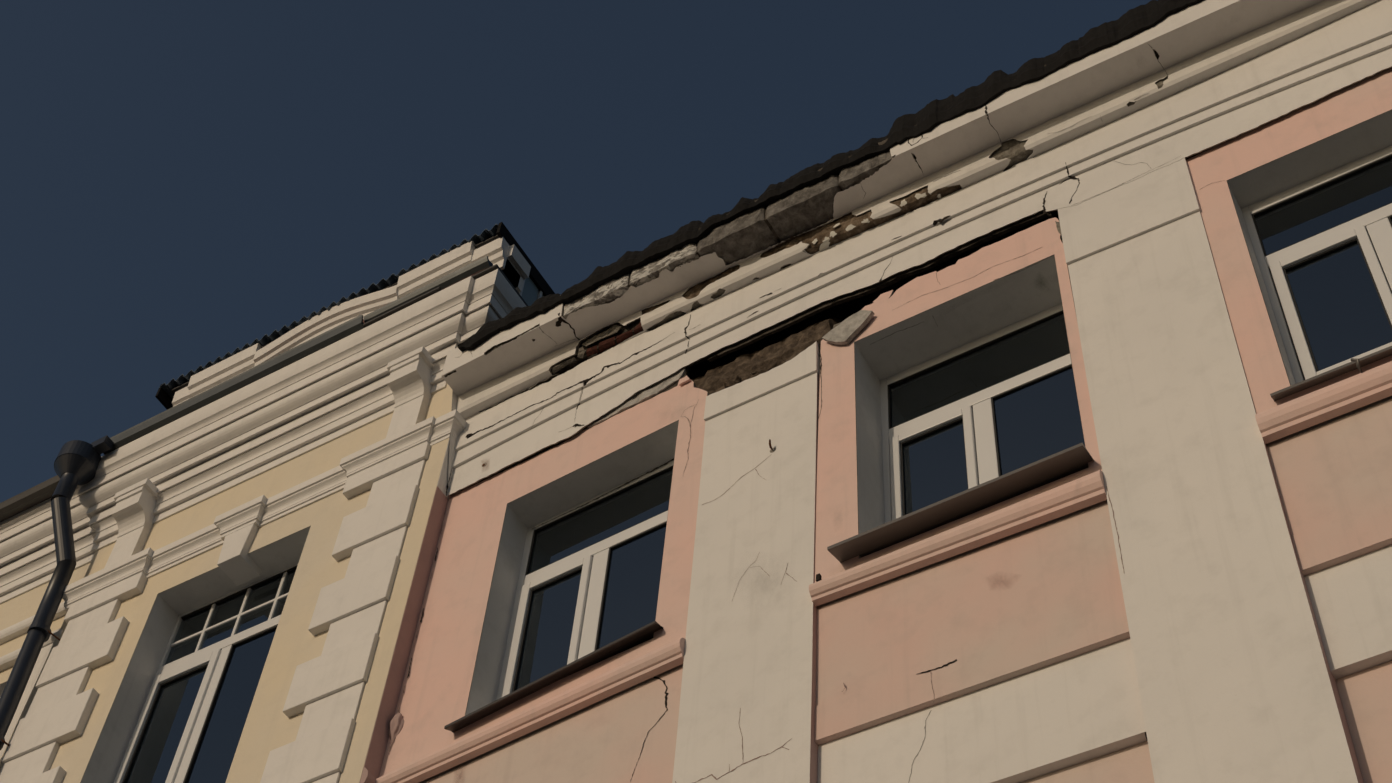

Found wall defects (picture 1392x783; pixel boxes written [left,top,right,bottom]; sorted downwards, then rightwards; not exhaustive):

flaking render [990,139,1033,171]
crack [1042,117,1178,214]
flaking render [761,185,962,268]
crack [933,216,950,225]
flaking render [536,265,740,387]
spalling [587,210,1062,428]
crack [870,236,1054,345]
crack [816,343,824,419]
crack [630,676,669,782]
crack [675,717,791,783]
crack [909,659,957,781]